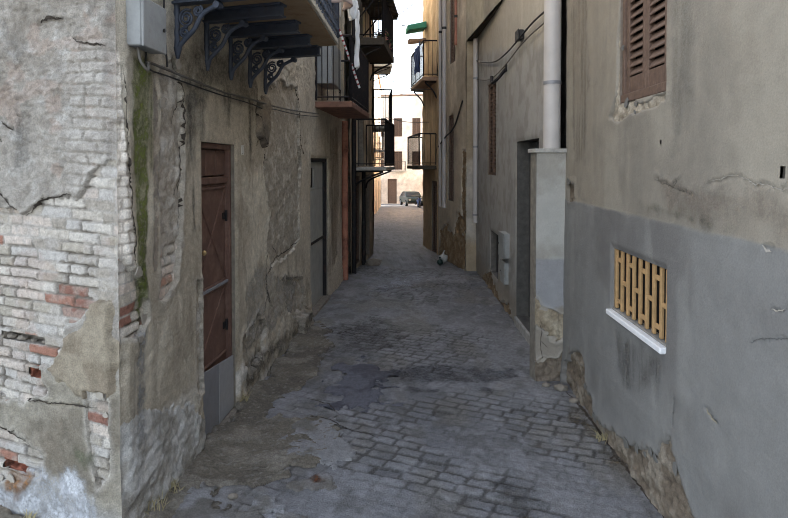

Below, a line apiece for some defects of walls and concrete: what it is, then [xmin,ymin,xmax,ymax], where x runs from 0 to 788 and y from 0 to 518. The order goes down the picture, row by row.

crack [41,15,62,23]
crack [73,38,105,46]
spalling [613,73,666,122]
flaking render [0,160,147,403]
spalling [535,296,563,343]
spalling [242,320,265,375]
crack [27,398,97,408]
flaking render [0,427,43,483]
spalling [86,391,111,485]
spalling [535,352,694,518]